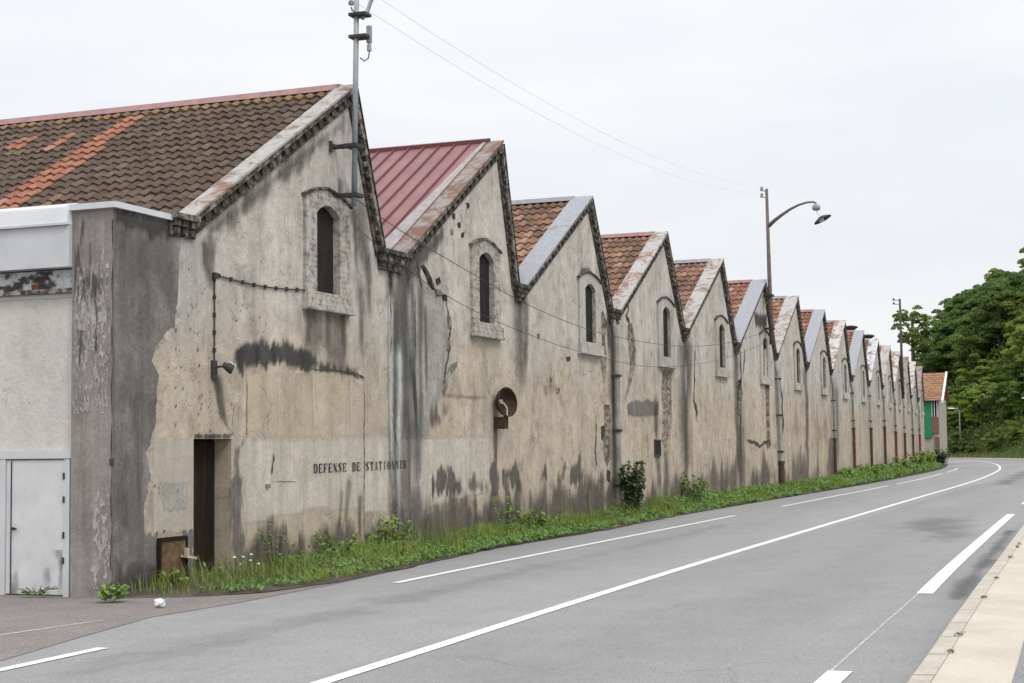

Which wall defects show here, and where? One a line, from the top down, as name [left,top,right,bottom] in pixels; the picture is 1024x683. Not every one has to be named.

peeling [0,271,58,292]
peeling [72,249,111,414]
damp [389,229,613,541]
flaking render [625,305,636,400]
flaking render [661,369,672,449]
crack [747,380,784,448]
peeling [90,489,110,589]